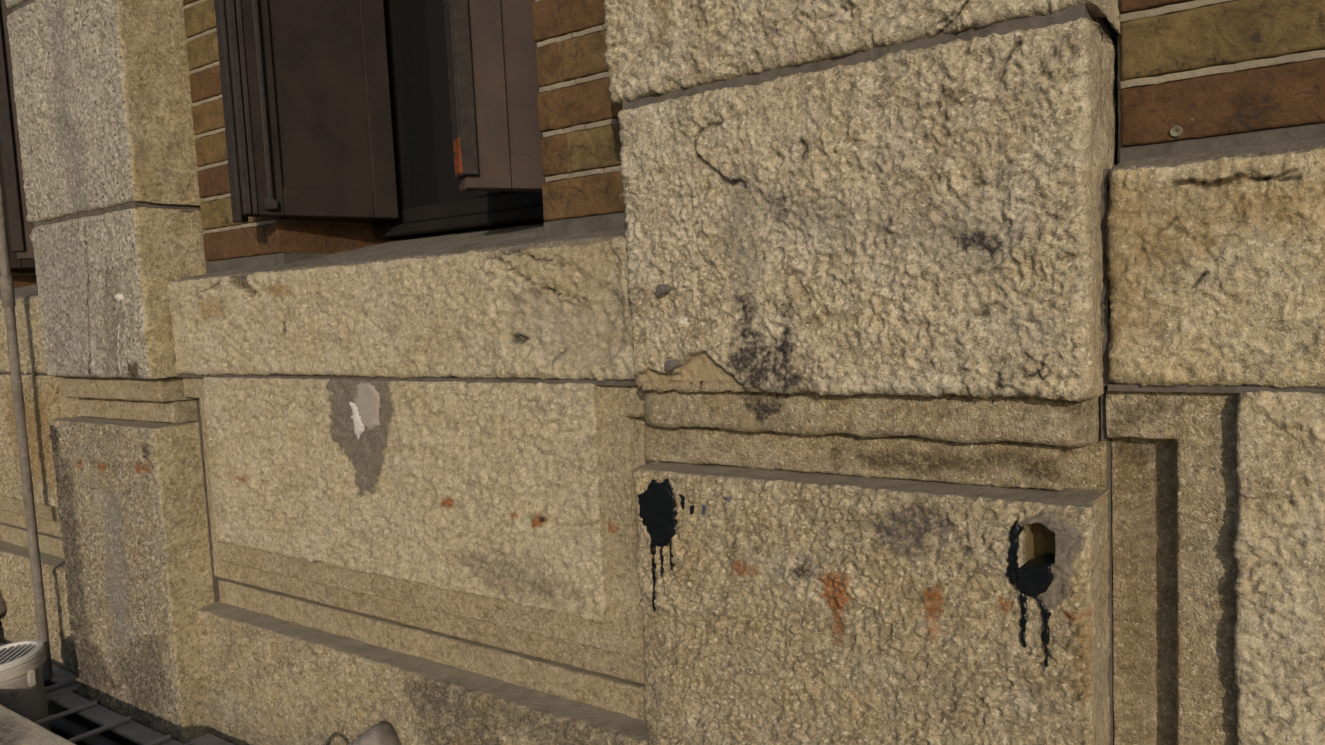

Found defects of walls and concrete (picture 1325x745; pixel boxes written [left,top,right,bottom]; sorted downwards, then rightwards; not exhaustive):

crack [697,123,746,187]
crack [1174,170,1296,187]
water stain [727,295,799,421]
peeling [349,382,381,440]